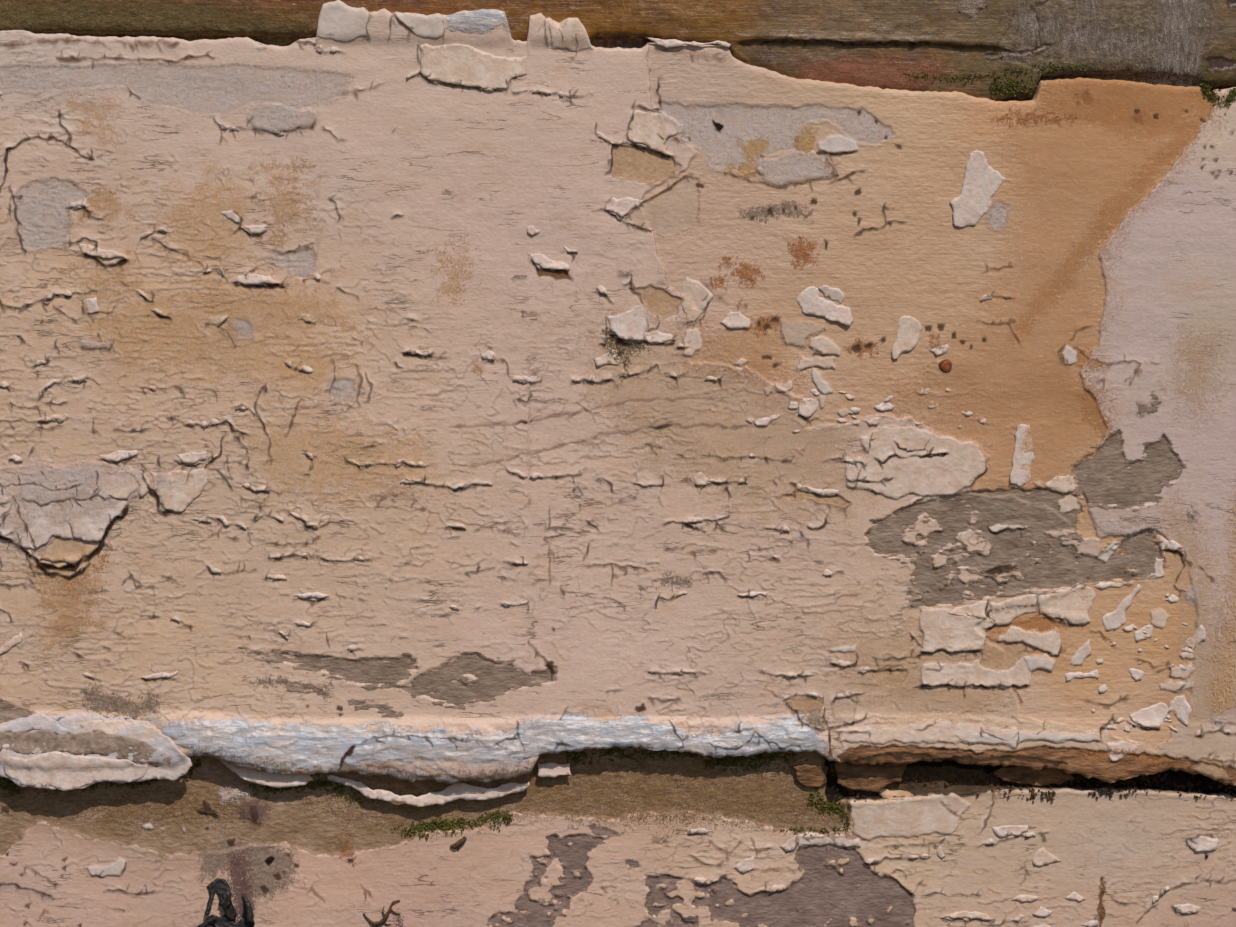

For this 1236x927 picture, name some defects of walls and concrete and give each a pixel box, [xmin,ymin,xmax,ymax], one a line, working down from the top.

crack [0,111,94,253]
peeling [13,175,127,259]
crack [69,205,285,320]
peeling [235,244,358,298]
peeling [514,246,578,280]
crack [0,290,89,474]
crack [92,360,370,580]
crack [346,445,828,607]
peeling [592,37,1236,786]
peeling [238,646,558,719]
crack [614,669,695,712]
peeling [0,712,971,927]